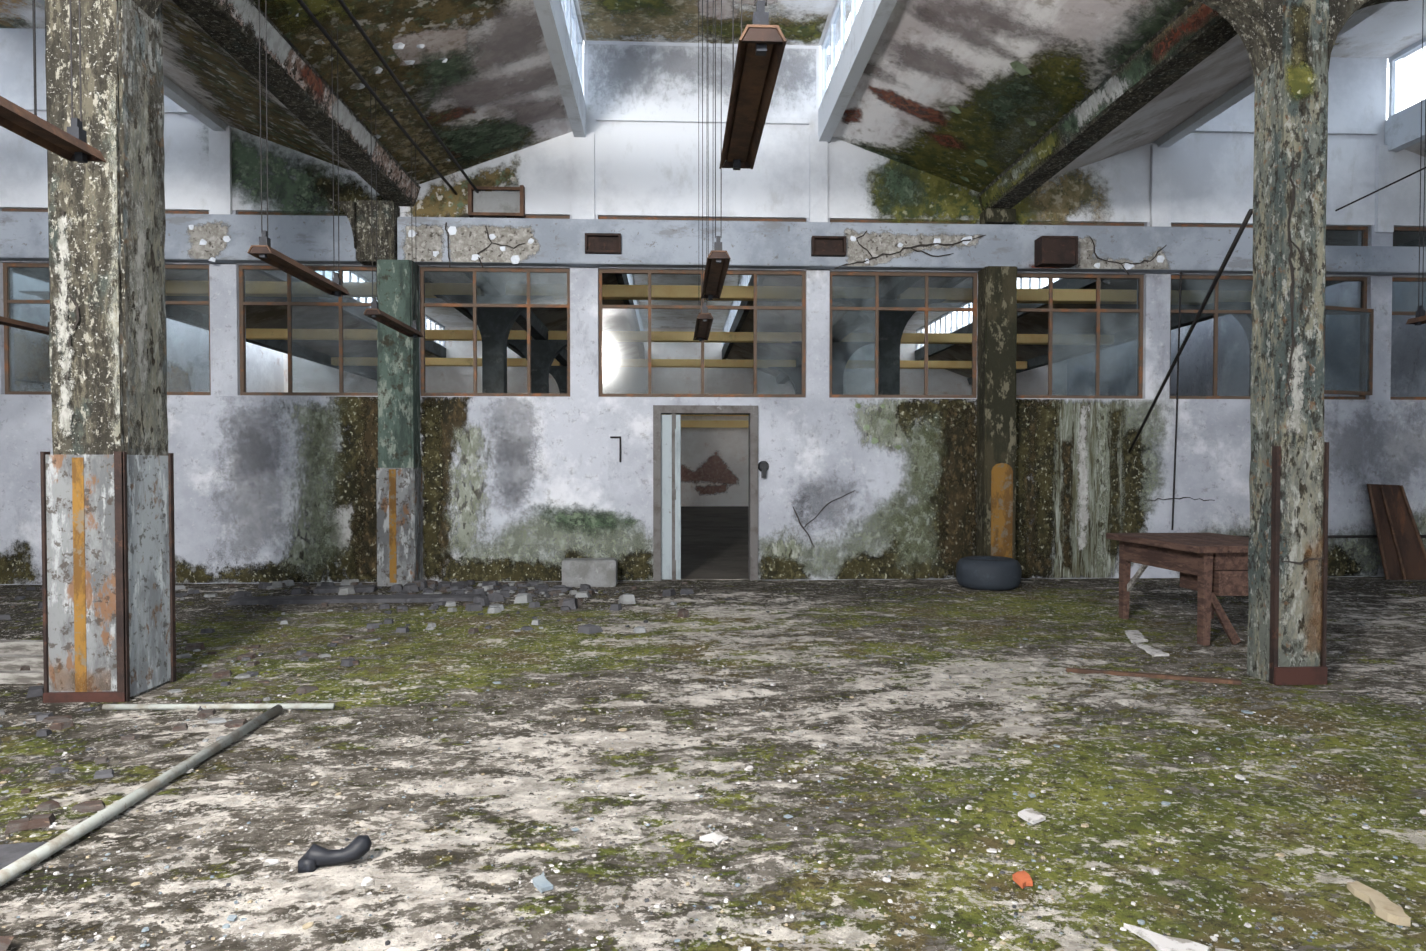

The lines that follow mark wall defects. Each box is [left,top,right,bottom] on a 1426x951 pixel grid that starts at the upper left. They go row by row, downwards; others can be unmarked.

water stain [162,1,385,216]
water stain [253,0,566,217]
water stain [850,0,1108,225]
peeling [403,224,541,264]
peeling [844,228,982,266]